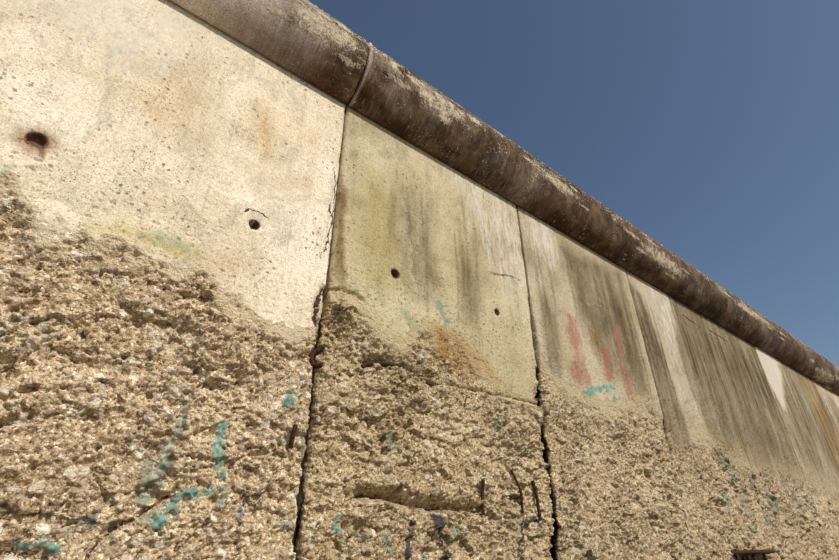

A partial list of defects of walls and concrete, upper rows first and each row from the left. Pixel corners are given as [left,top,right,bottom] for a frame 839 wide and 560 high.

crack [320,171,336,260]
leakage [529,215,558,265]
peeling [526,158,588,210]
crack [312,288,323,327]
leakage [650,287,677,359]
spalling [0,171,839,560]
leakage [754,346,785,410]